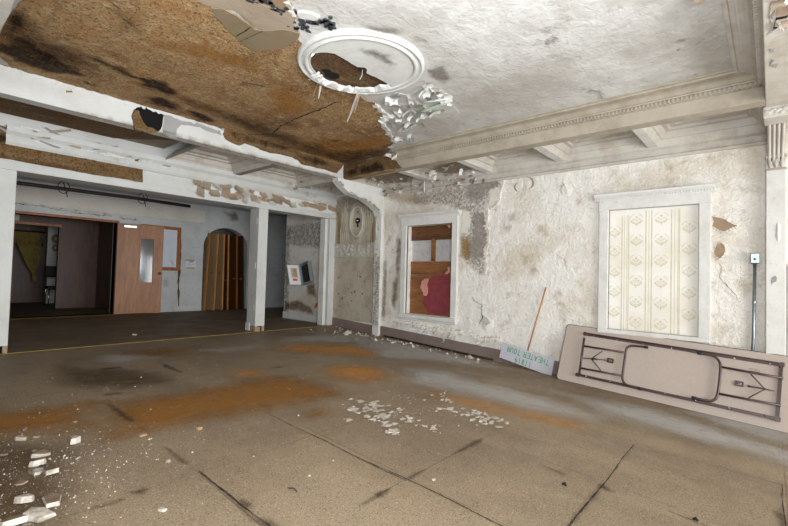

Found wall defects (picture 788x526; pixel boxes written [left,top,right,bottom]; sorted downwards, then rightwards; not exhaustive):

peeling [766,0,788,36]
crack [248,102,337,137]
flaking render [0,0,502,347]
flaking render [711,215,739,260]